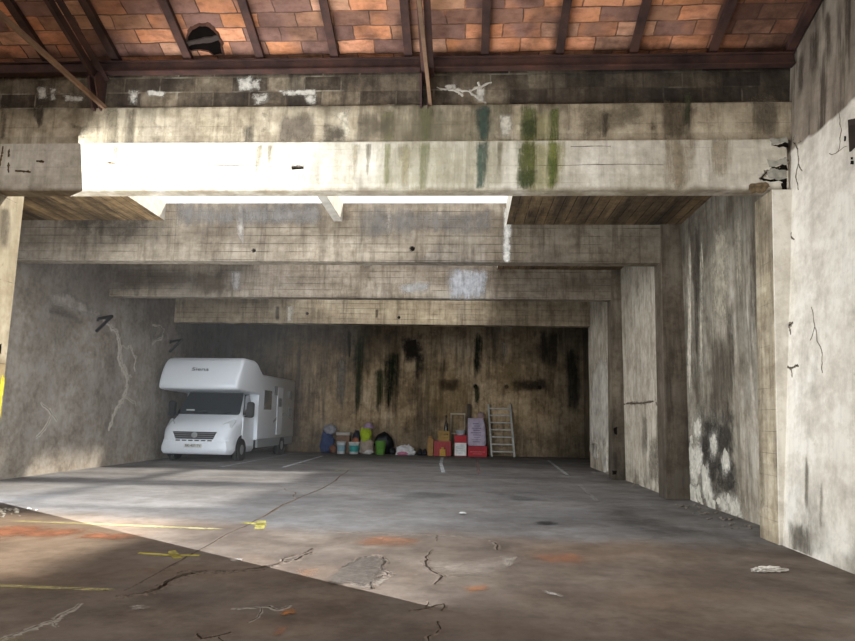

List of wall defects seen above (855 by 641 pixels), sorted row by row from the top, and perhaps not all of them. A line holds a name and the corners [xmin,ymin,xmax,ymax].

leakage [518,107,536,187]
leakage [547,109,558,188]
spalling [749,137,790,194]
leakage [376,353,399,407]
leakage [474,335,482,372]
leakage [514,379,545,390]
leakage [540,332,580,408]
crack [788,307,823,373]
peeling [689,418,742,518]
crack [114,470,348,599]
crack [342,554,397,589]
crack [408,549,490,641]